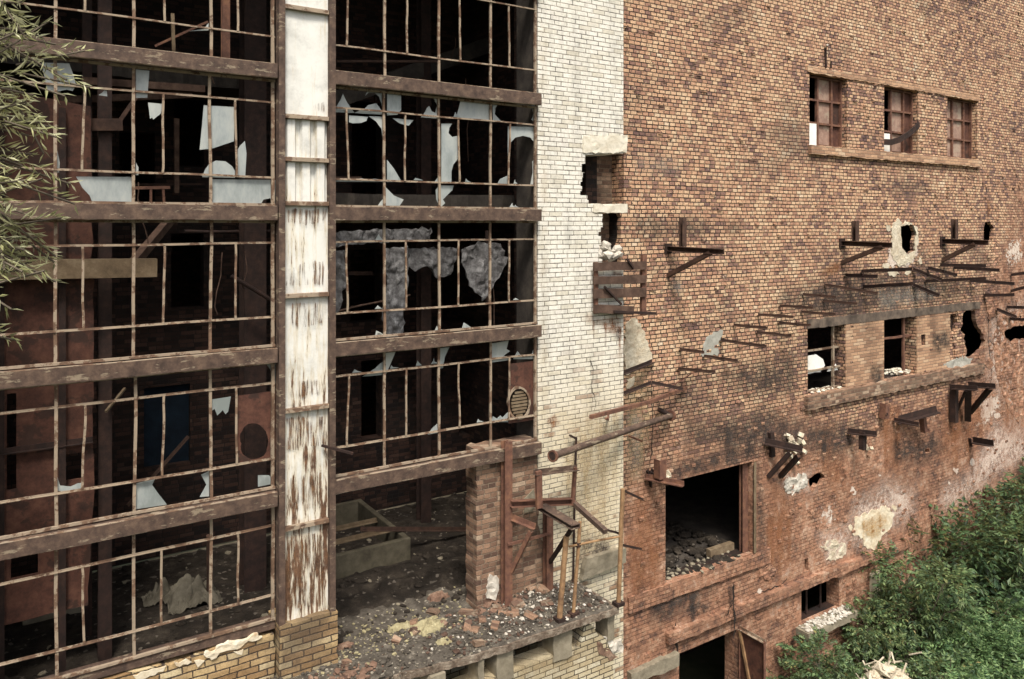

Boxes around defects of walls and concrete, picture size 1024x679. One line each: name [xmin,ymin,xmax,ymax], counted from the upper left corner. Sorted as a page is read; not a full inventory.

corrosion [288,208,327,228]
corrosion [286,261,324,285]
peeling [882,257,922,277]
spalling [943,238,1024,428]
corrosion [291,380,318,398]
corrosion [291,473,321,510]
spalling [784,473,809,495]
spalling [820,539,847,560]
corrosion [287,534,324,608]